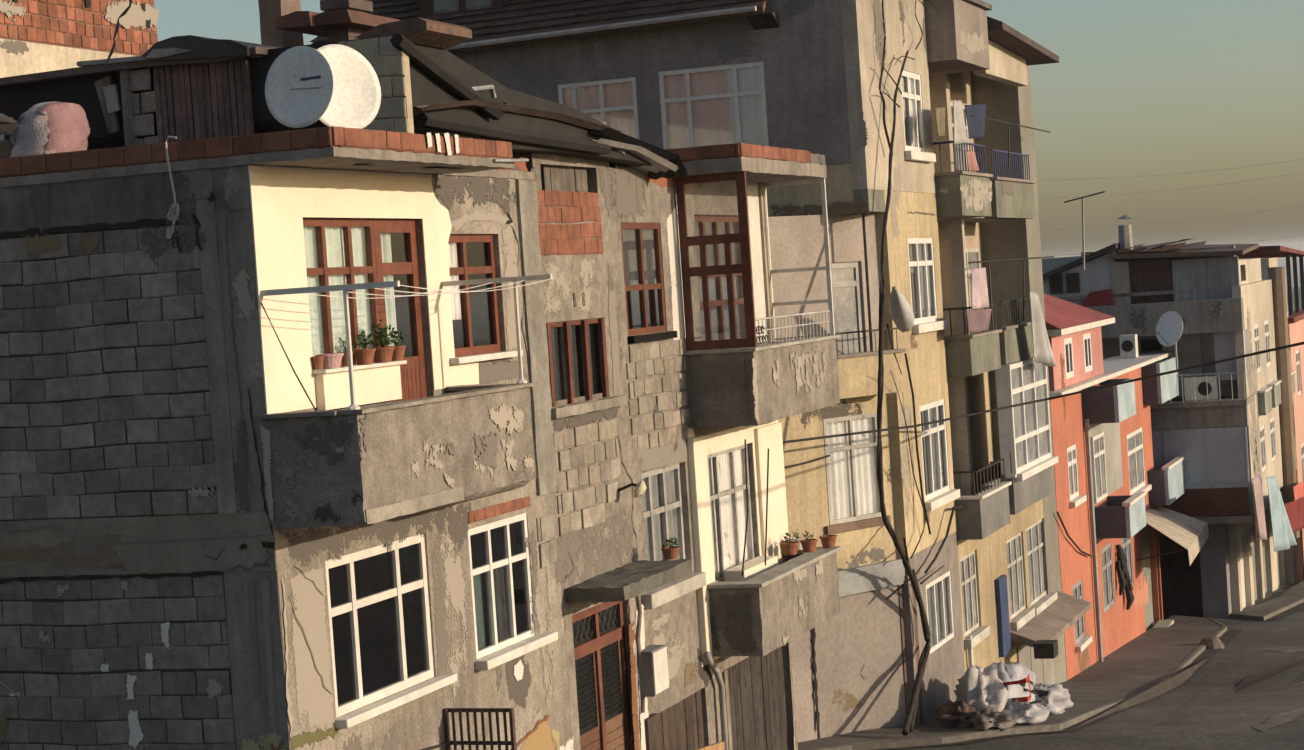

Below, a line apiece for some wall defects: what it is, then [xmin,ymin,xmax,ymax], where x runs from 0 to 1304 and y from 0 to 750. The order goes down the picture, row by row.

flaking render [537,190,604,255]
crack [0,192,333,734]
spalling [520,718,574,750]